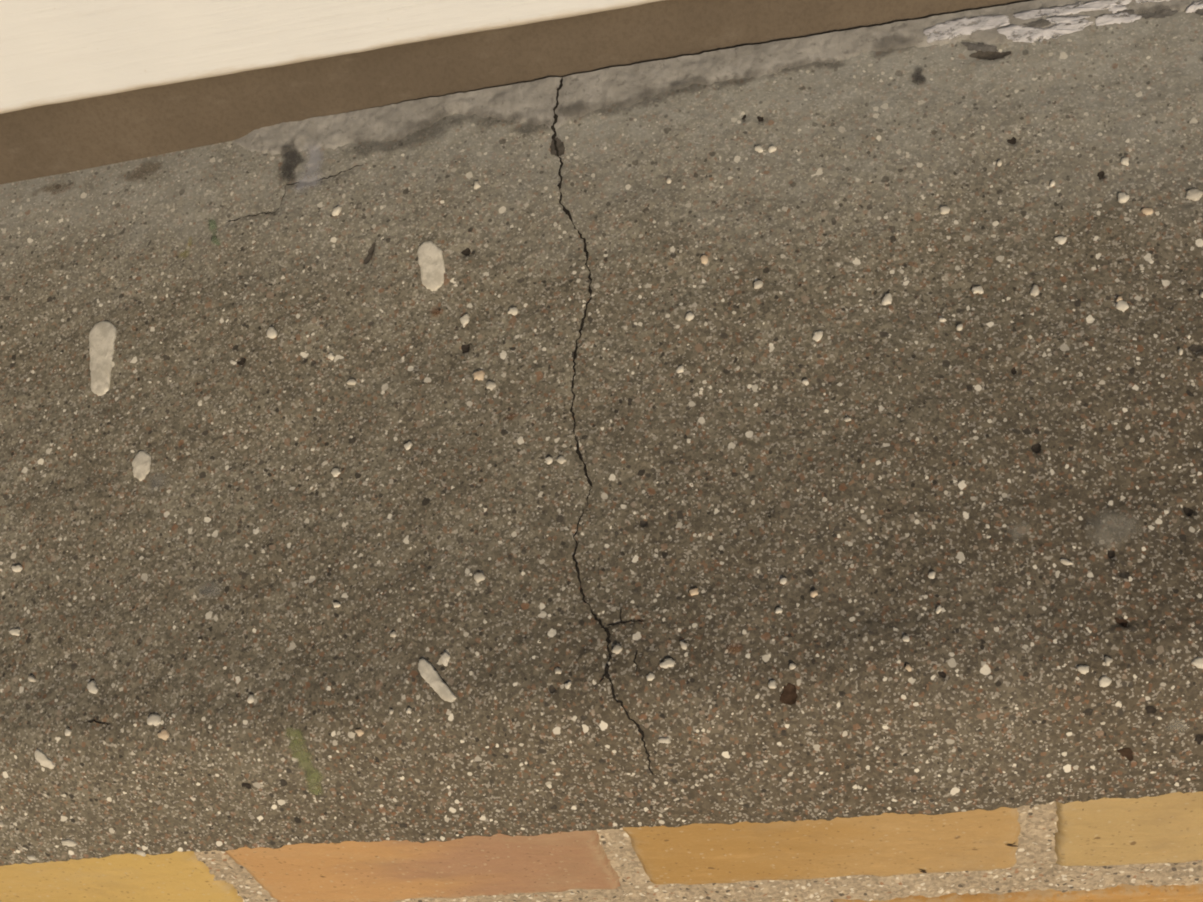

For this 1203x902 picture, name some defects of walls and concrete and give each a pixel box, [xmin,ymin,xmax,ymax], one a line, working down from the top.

crack [550,76,653,775]